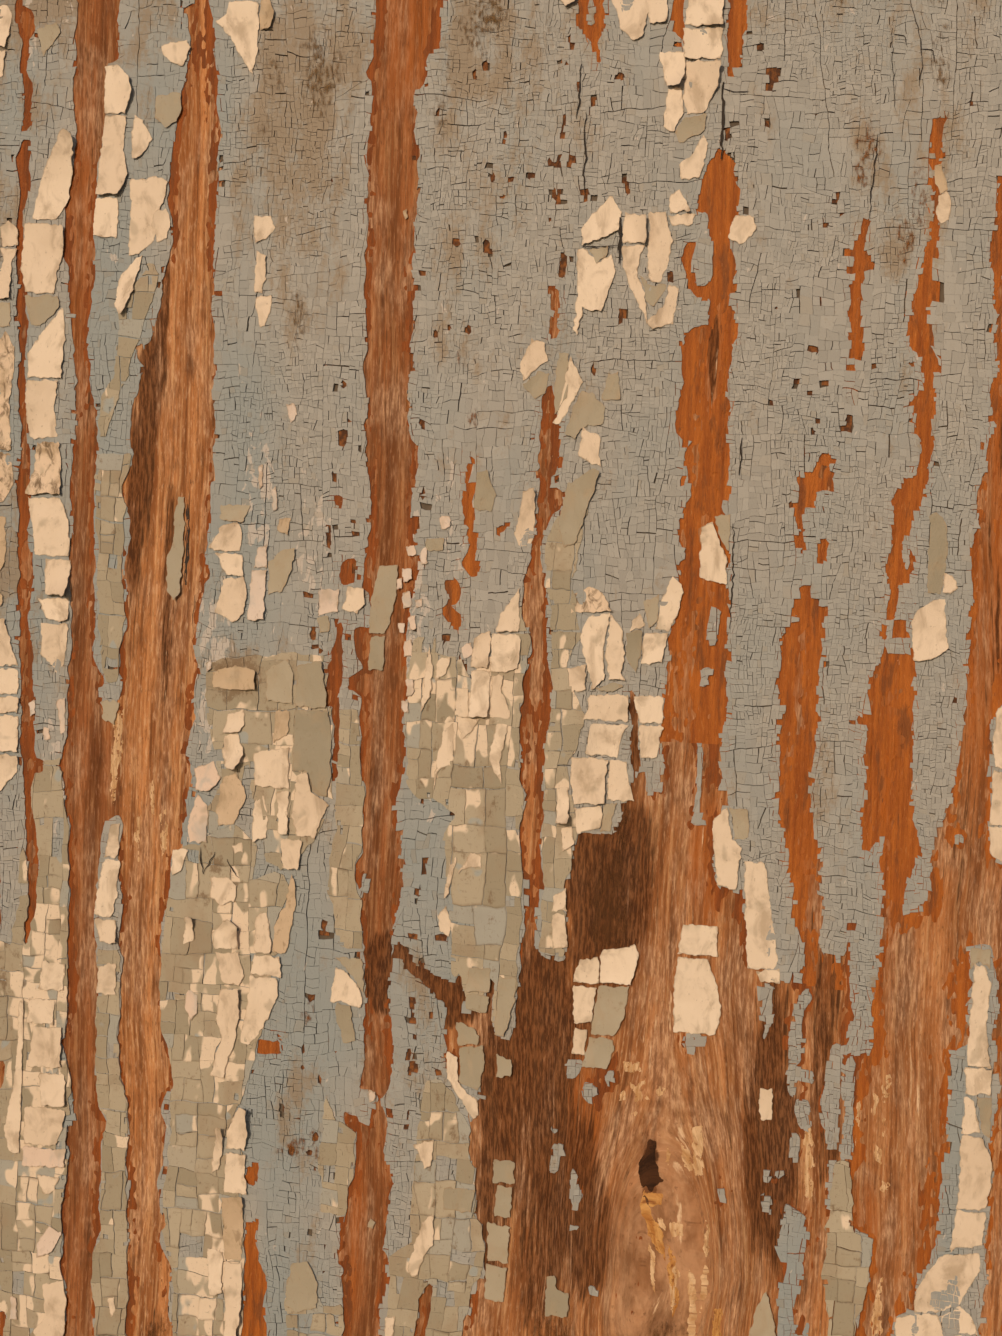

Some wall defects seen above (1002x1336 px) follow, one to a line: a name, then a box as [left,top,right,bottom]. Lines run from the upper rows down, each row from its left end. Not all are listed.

peeling [131,115,152,158]
crack [576,64,587,199]
peeling [561,0,751,143]
crack [720,82,748,159]
crack [869,0,934,218]
crack [581,217,622,264]
peeling [545,286,566,340]
peeling [789,192,876,570]
peeling [337,419,357,449]
crack [184,479,197,633]
crack [728,525,736,629]
peeling [405,997,433,1075]